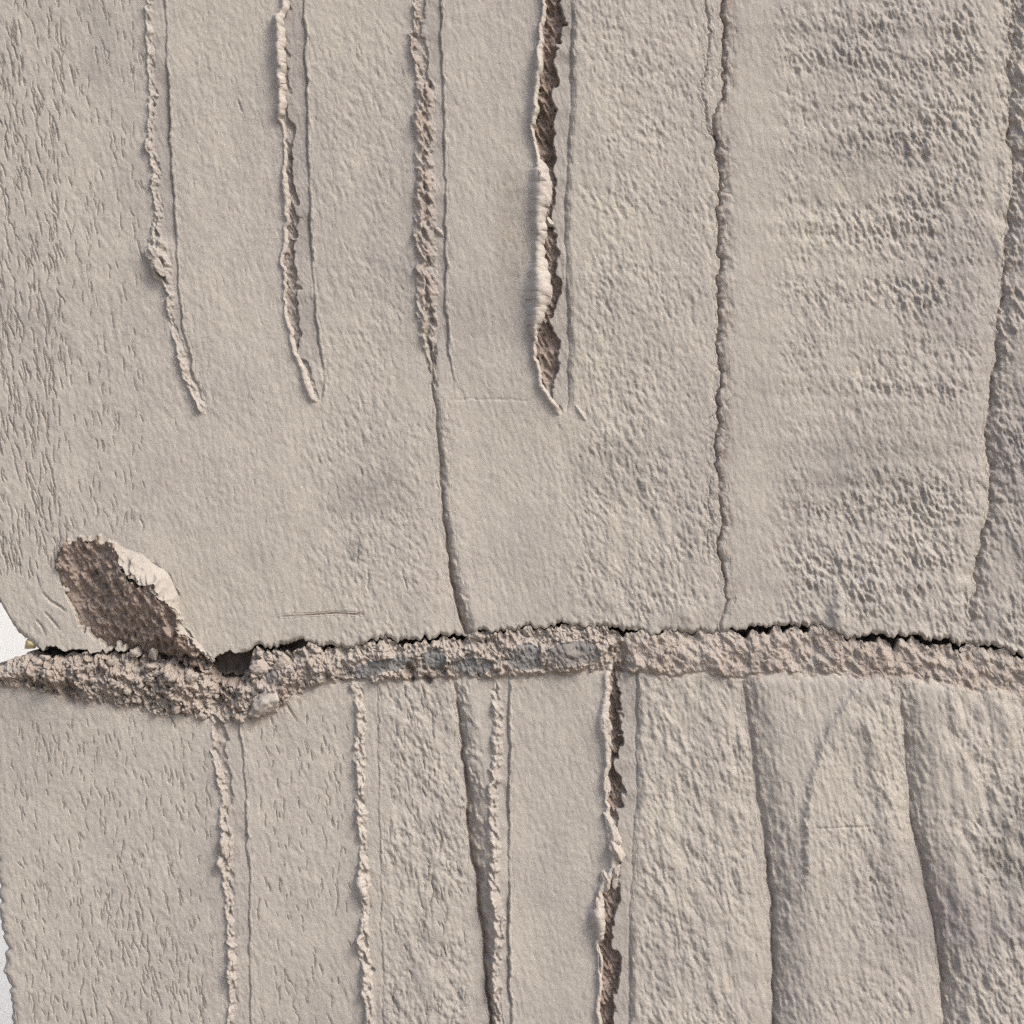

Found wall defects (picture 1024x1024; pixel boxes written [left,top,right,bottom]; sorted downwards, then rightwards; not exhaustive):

crack [0,0,209,659]
spalling [56,535,217,673]
crack [11,671,517,1024]
crack [211,0,691,676]
crack [697,0,807,637]
crack [855,0,1024,656]